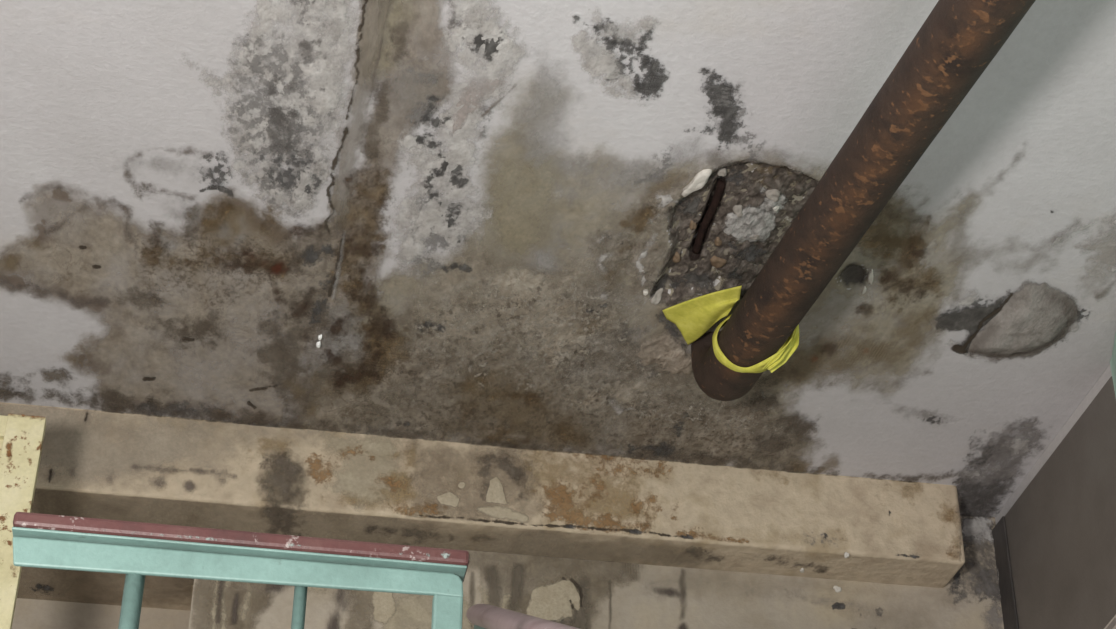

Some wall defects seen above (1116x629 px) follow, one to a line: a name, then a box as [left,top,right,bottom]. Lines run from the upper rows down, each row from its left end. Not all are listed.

crack [324,0,368,297]
water stain [0,0,974,522]
spalling [561,159,819,414]
rust [858,198,940,302]
rust [739,341,848,459]
water stain [31,489,227,529]
rust [305,435,446,516]
water stain [260,453,719,629]
rust [533,449,749,543]
water stain [172,577,284,629]
peeling [372,592,434,629]
peeling [526,577,583,622]